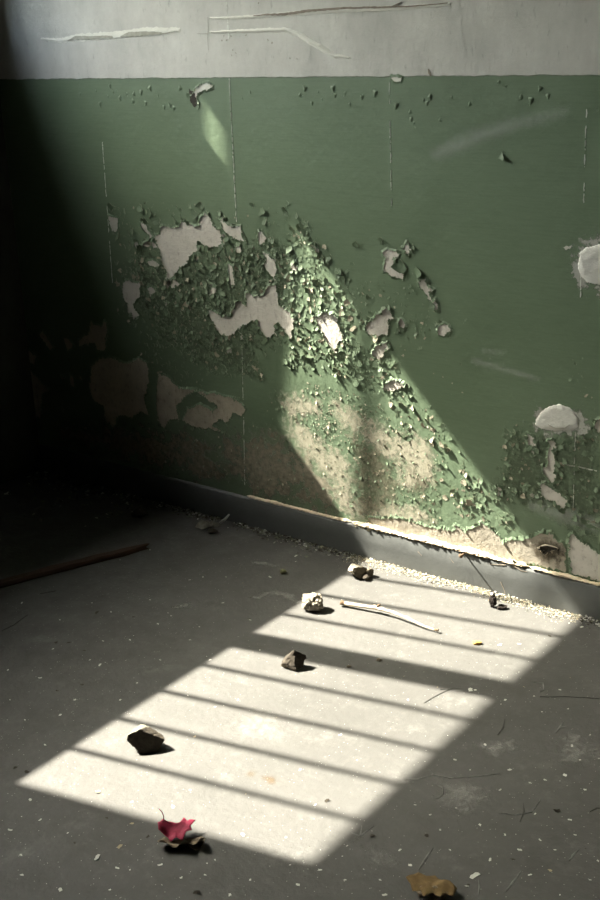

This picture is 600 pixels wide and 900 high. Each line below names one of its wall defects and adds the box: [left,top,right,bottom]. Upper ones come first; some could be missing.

peeling [186,81,215,109]
peeling [88,355,247,435]
peeling [119,202,600,586]